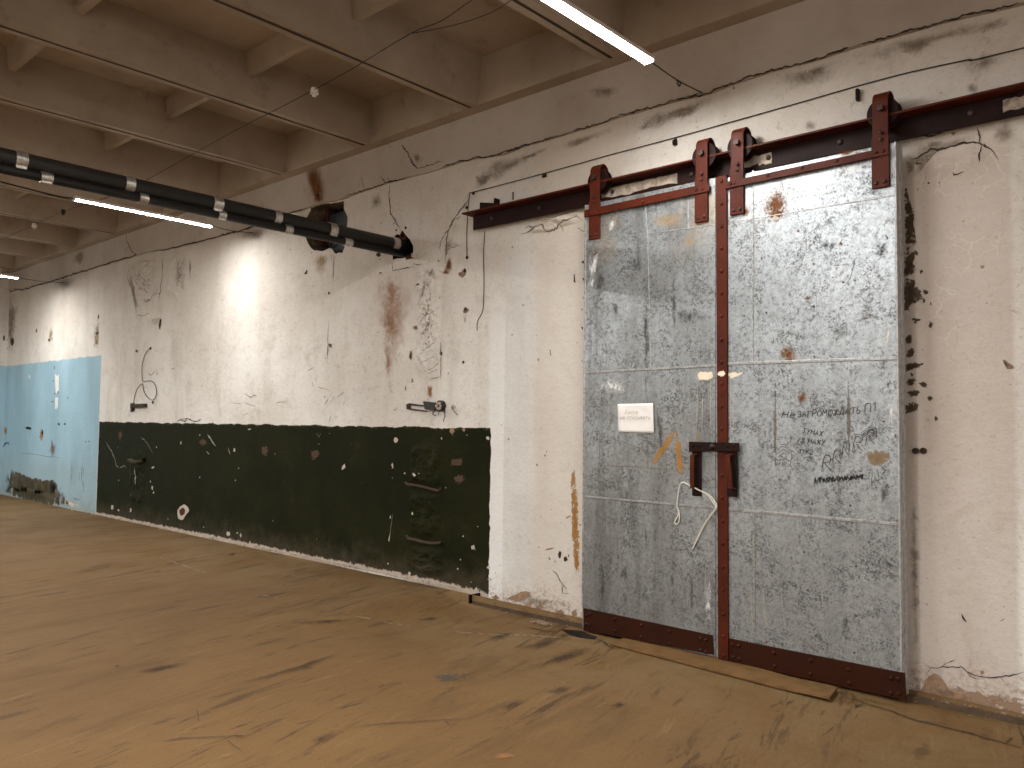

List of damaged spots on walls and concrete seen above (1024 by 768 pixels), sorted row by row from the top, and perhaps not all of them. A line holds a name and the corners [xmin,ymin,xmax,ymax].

crack [346,3,1018,230]
corrosion [309,170,322,202]
spalling [307,201,348,227]
crack [520,211,584,235]
corrosion [764,191,786,218]
spalling [306,237,345,254]
flaking render [904,182,940,414]
peeling [5,470,69,505]
crack [926,660,1023,680]